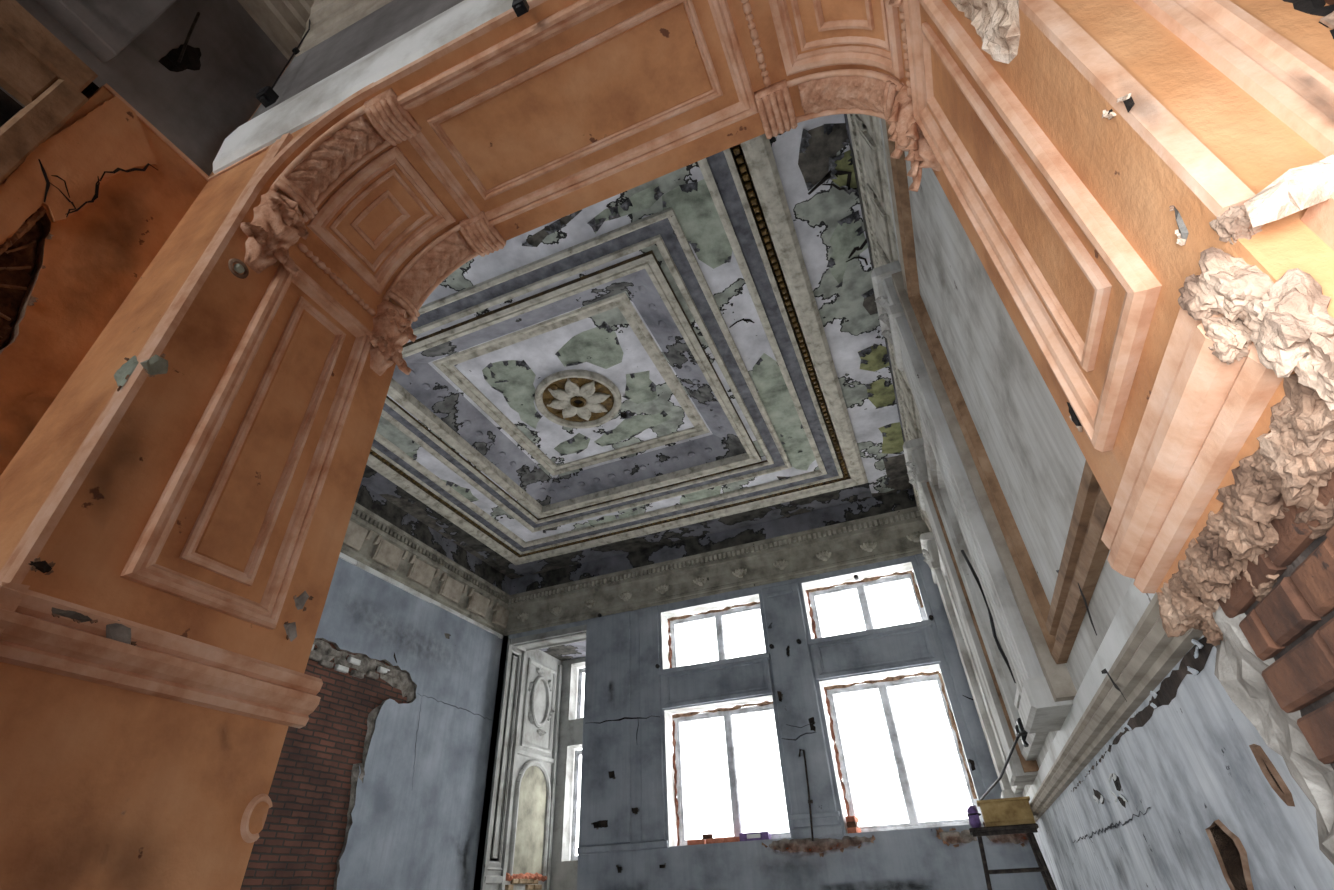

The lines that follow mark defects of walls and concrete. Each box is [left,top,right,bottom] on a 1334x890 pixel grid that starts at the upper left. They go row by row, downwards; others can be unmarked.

spalling [950,0,1020,64]
spalling [1283,0,1334,39]
flaking render [0,96,157,349]
crack [38,159,158,217]
peeling [522,179,733,269]
peeling [798,123,868,288]
peeling [482,360,542,429]
peeling [554,321,672,456]
peeling [858,344,897,409]
spalling [1067,402,1083,432]
peeling [839,422,912,505]
spalling [1071,154,1334,865]